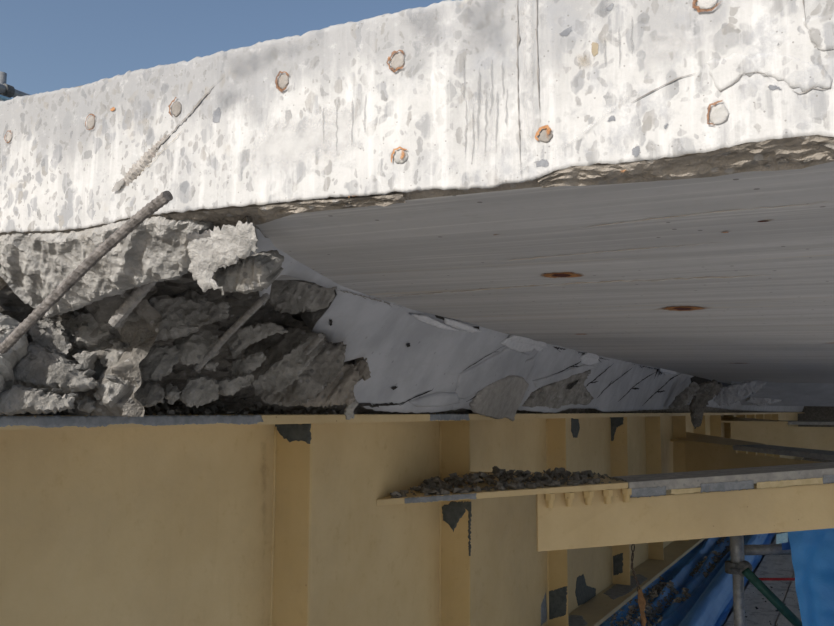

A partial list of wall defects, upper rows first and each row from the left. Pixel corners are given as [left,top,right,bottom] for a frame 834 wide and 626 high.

rust [692,0,718,12]
rust [387,50,405,72]
rust [275,71,289,92]
rust [154,78,221,151]
rust [707,100,729,125]
rust [535,125,553,143]
rust [391,146,408,164]
spalling [0,191,407,355]
spalling [194,293,270,372]
peeling [0,414,264,428]
peeling [275,424,312,444]
peeling [404,493,477,556]